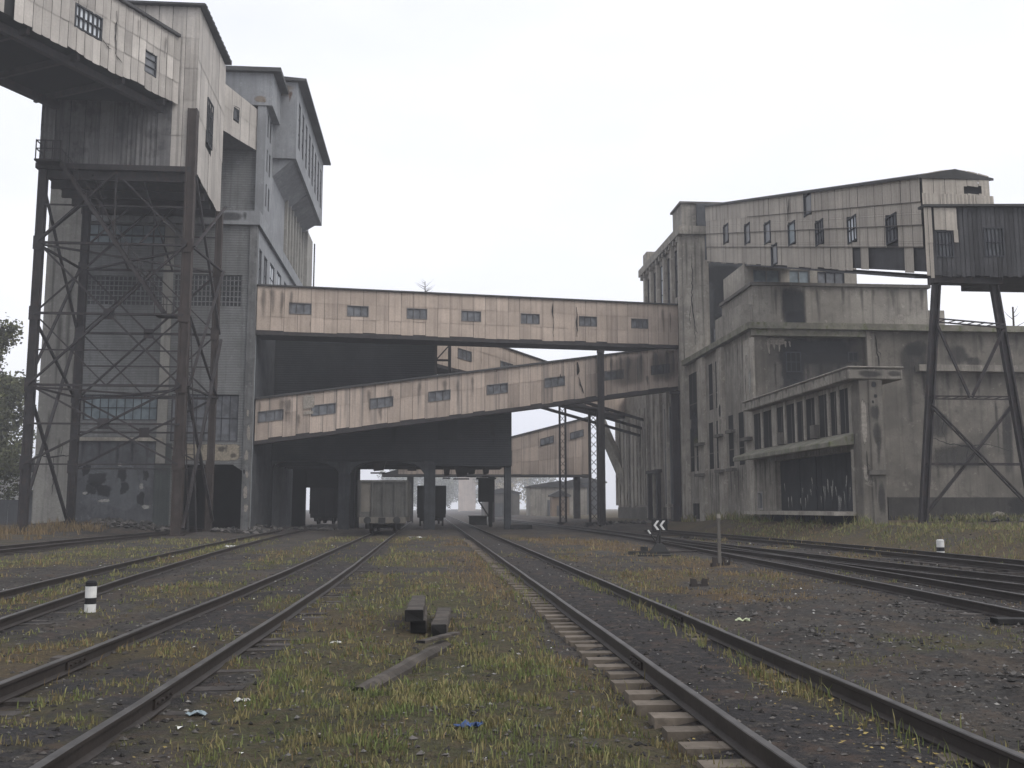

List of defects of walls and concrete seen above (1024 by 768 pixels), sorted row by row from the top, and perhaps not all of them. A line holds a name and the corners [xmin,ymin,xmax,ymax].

crack [552,305,578,337]
flaking render [82,463,149,509]